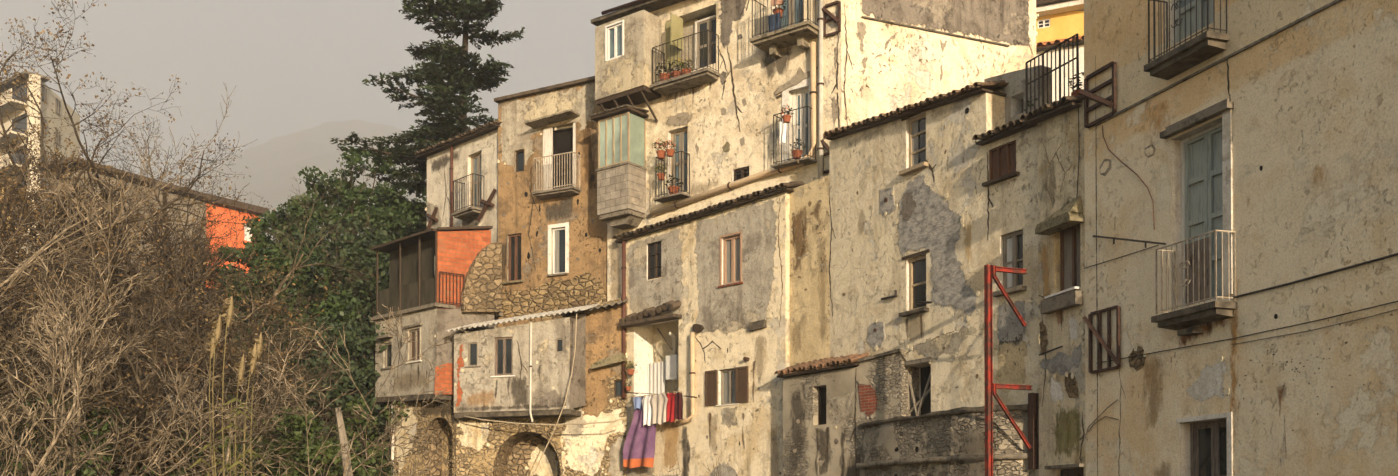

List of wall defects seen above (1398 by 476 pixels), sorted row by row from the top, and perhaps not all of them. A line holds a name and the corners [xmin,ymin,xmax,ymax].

crack [717,45,743,132]
spalling [884,174,980,321]